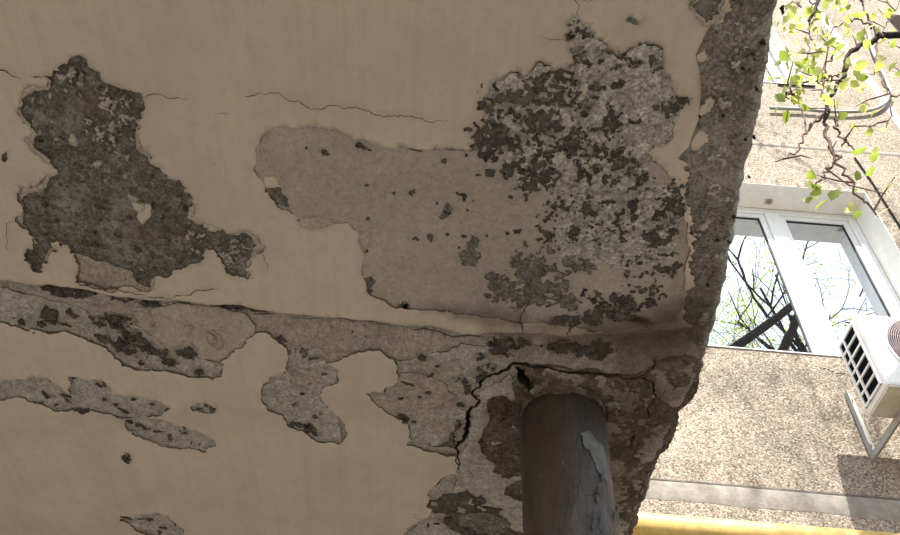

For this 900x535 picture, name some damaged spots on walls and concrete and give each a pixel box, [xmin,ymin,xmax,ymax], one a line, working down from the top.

spalling [689,0,757,72]
crack [76,282,216,300]
spalling [0,16,736,535]
crack [514,295,530,332]
crack [428,356,659,490]